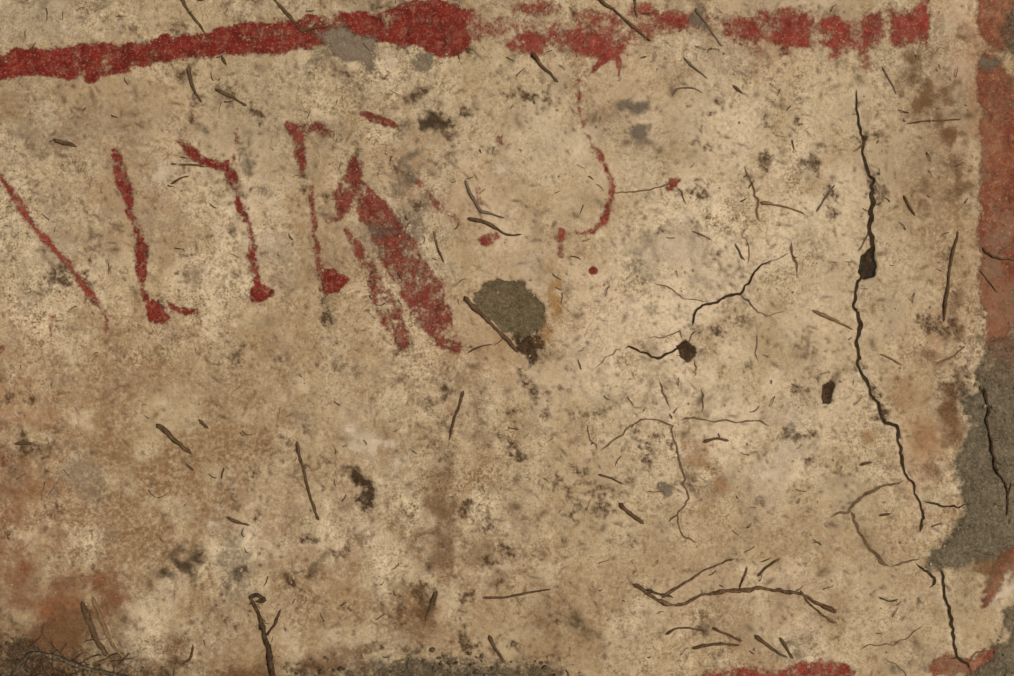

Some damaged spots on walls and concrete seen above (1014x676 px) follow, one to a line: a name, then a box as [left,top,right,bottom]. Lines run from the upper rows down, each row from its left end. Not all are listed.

spalling [473,279,546,365]
crack [587,165,798,543]
crack [832,89,986,675]